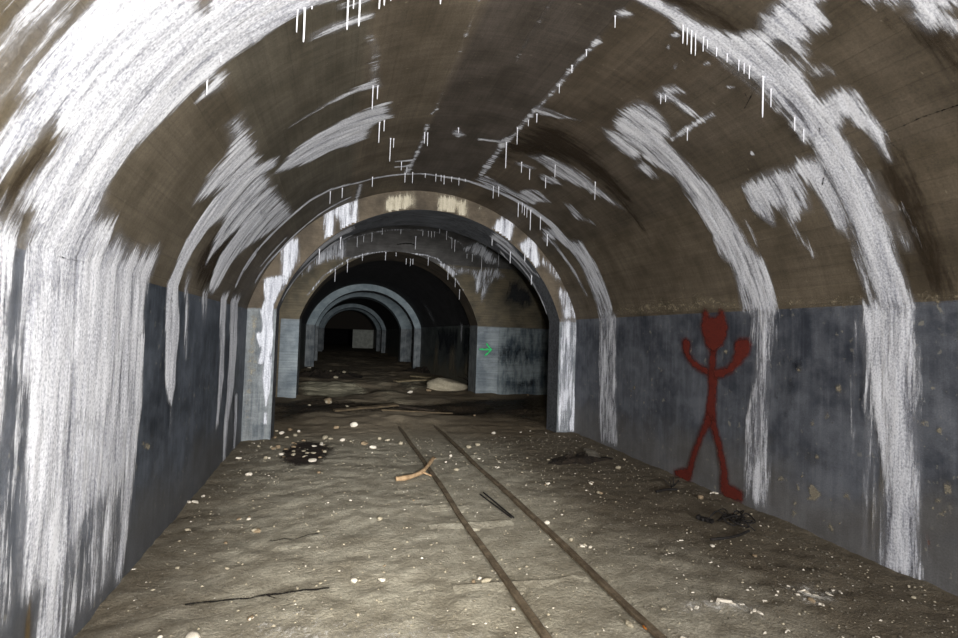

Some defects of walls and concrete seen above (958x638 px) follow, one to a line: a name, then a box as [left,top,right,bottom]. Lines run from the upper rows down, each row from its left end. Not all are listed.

damp [887,0,958,66]
damp [0,0,391,638]
damp [165,39,631,461]
damp [605,87,777,504]
damp [638,0,944,580]
crack [185,587,330,605]